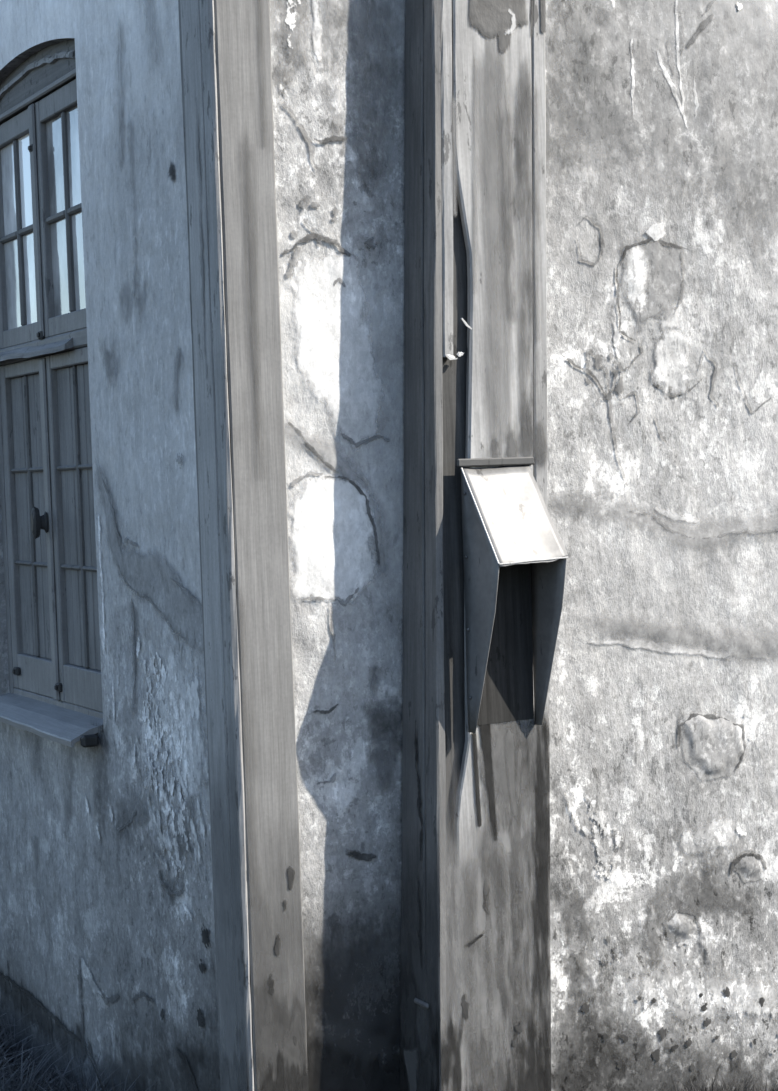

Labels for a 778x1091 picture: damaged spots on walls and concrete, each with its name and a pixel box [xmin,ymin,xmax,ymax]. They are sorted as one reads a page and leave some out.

peeling [277,0,322,96]
water stain [246,171,259,422]
crack [283,219,351,278]
crack [577,216,604,266]
crack [562,322,667,485]
crack [700,348,771,413]
crack [98,469,204,651]
crack [301,588,359,659]
crack [286,422,389,573]
water stain [97,705,778,1091]